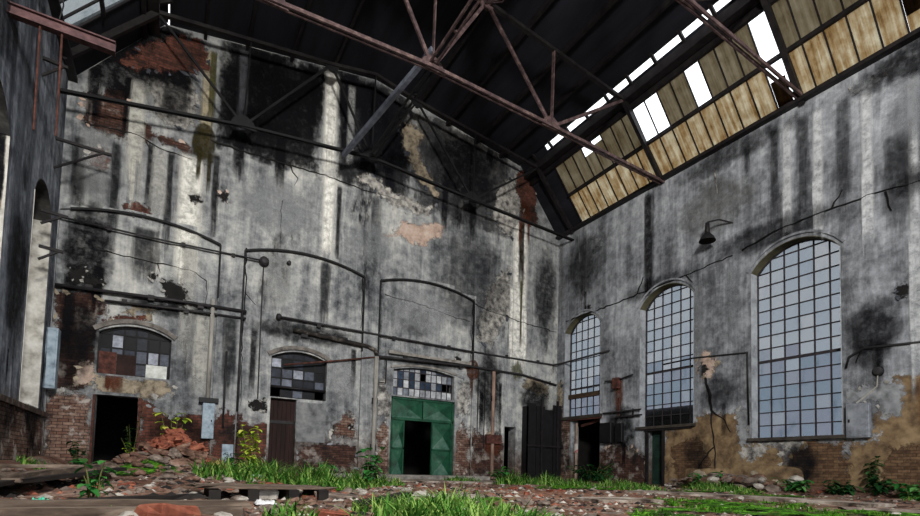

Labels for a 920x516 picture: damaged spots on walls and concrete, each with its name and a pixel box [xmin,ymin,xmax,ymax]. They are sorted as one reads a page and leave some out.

flaking render [76,89,134,171]
flaking render [122,198,152,220]
flaking render [120,34,211,155]
water stain [275,162,284,183]
water stain [312,74,355,251]
flaking render [357,120,445,247]
rust [519,203,530,242]
flaking render [0,264,267,471]
water stain [874,342,883,377]
flaking render [375,373,392,473]
flaking render [455,375,504,477]
flaking render [665,374,920,488]